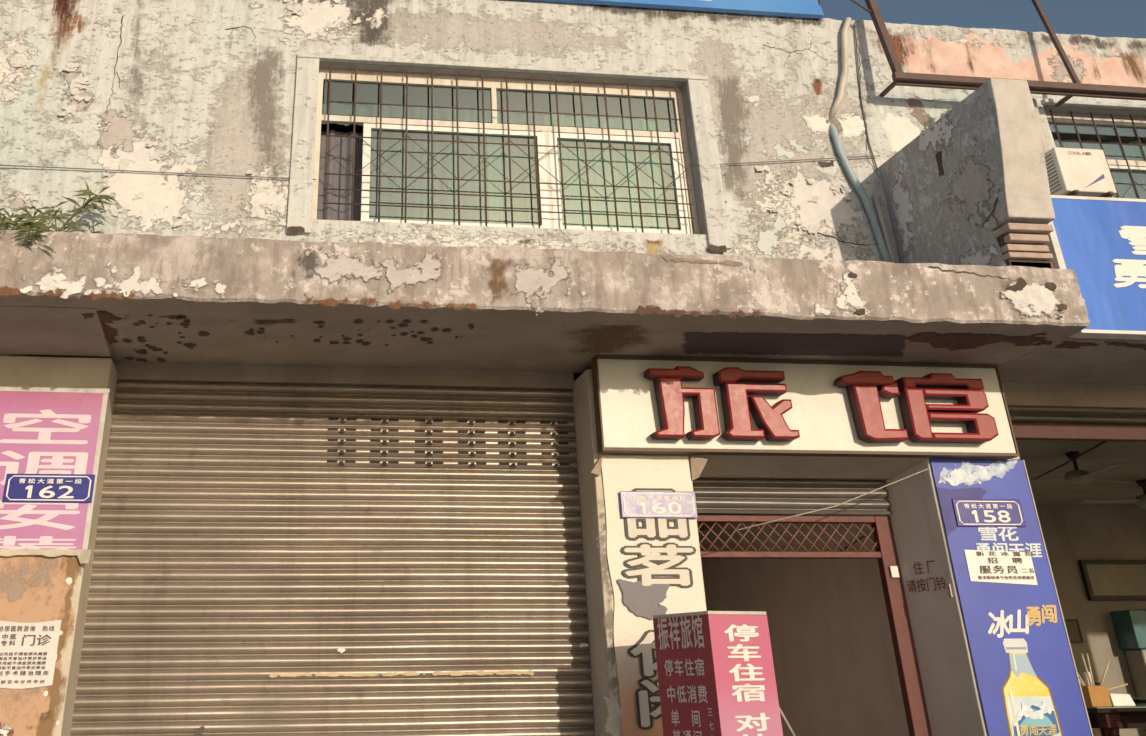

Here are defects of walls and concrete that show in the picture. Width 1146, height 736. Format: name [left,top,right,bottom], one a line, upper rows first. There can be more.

peeling [0,41,35,105]
corrosion [54,0,84,41]
peeling [54,62,305,238]
damp [248,50,284,173]
damp [320,0,392,46]
corrosion [878,35,908,66]
corrosion [1121,52,1146,80]
peeling [717,96,1146,351]
peeling [0,261,228,362]
peeling [298,239,477,346]
peeling [511,257,588,316]
peeling [0,555,82,736]